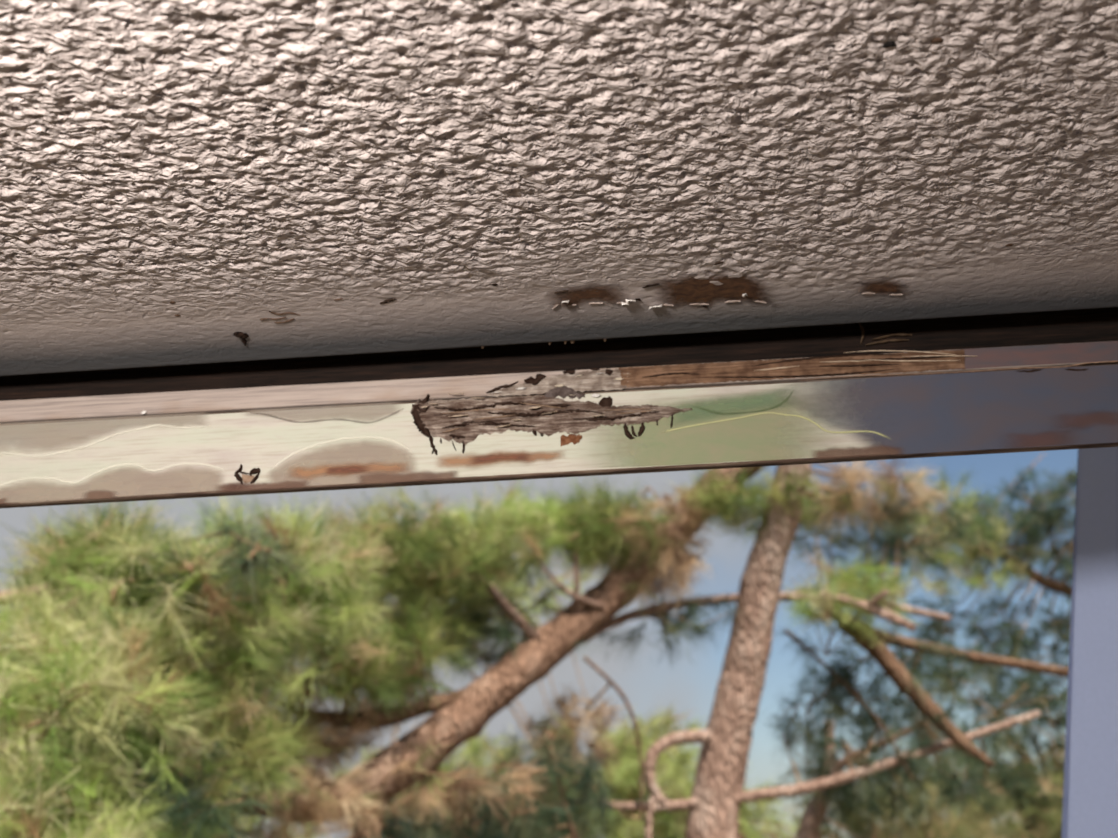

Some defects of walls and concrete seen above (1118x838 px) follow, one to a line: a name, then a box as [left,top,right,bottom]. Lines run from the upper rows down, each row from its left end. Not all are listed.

peeling [552,261,768,309]
peeling [861,281,903,296]
peeling [560,433,582,446]